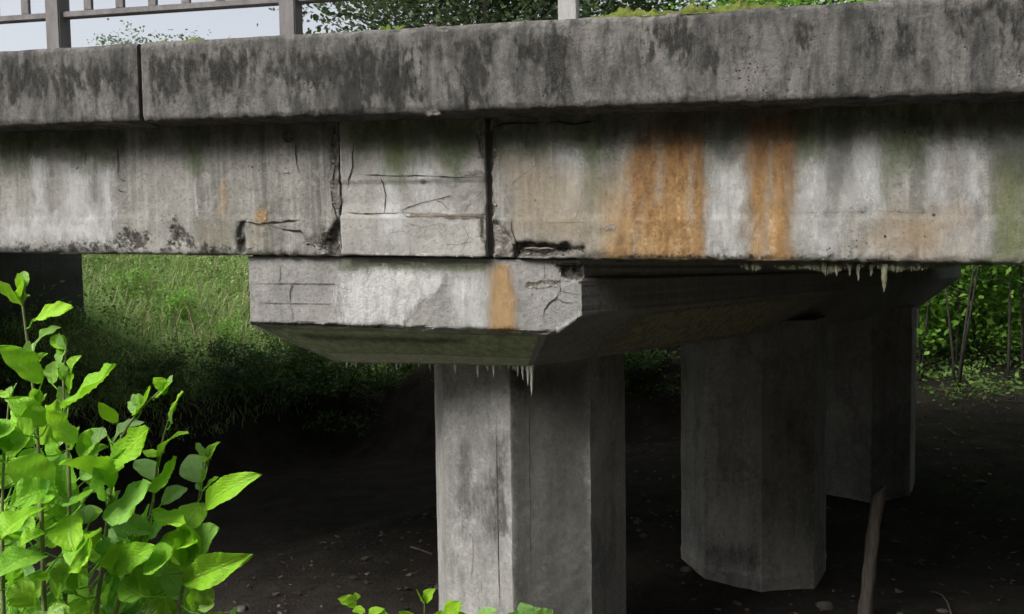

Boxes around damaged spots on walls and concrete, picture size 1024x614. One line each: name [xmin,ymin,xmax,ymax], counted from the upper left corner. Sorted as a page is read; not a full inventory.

water stain [0,35,427,116]
water stain [514,23,573,108]
water stain [647,14,693,64]
crack [249,219,304,235]
spalling [305,133,342,255]
crack [327,123,528,247]
spalling [478,195,585,289]
rust [609,121,705,258]
rust [751,135,791,259]
rust [492,264,513,332]
crack [542,266,578,318]
water stain [324,352,588,614]